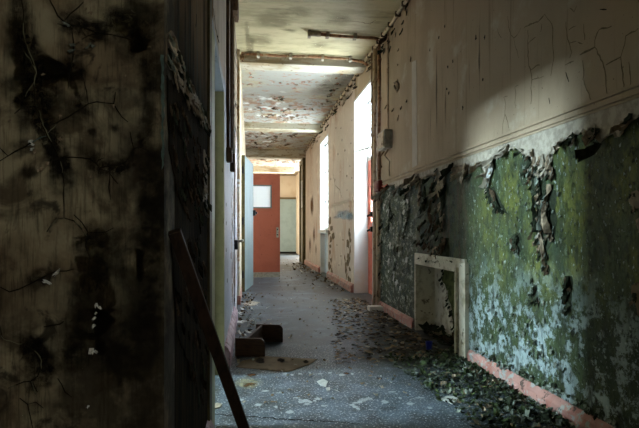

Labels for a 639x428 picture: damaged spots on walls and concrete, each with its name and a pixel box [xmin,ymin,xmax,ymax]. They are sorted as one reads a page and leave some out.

crack [0,0,147,292]
peeling [160,30,212,303]
peeling [246,74,357,149]
peeling [370,98,639,334]
crack [498,6,639,129]
water stain [61,237,122,369]
peeling [171,245,209,408]